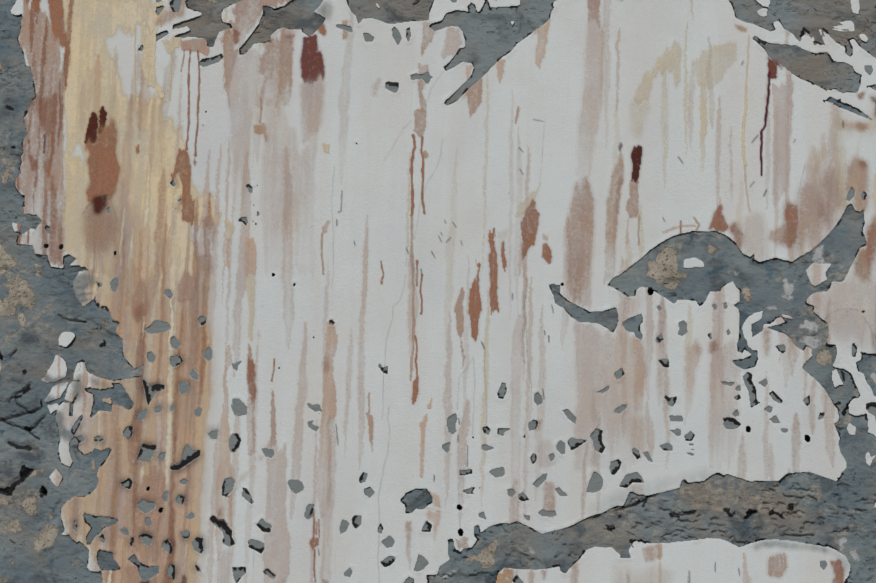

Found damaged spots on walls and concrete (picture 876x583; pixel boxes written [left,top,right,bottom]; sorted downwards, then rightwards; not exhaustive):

flaking render [156,0,243,67]
flaking render [239,0,325,55]
corrosion [261,24,326,124]
flaking render [336,0,557,106]
flaking render [729,0,876,120]
flaking render [0,0,200,583]
corrosion [84,106,120,250]
corrosion [410,73,428,404]
corrosion [454,228,506,361]
corrosion [518,199,552,273]
corrosion [606,143,642,243]
flaking render [400,187,876,583]